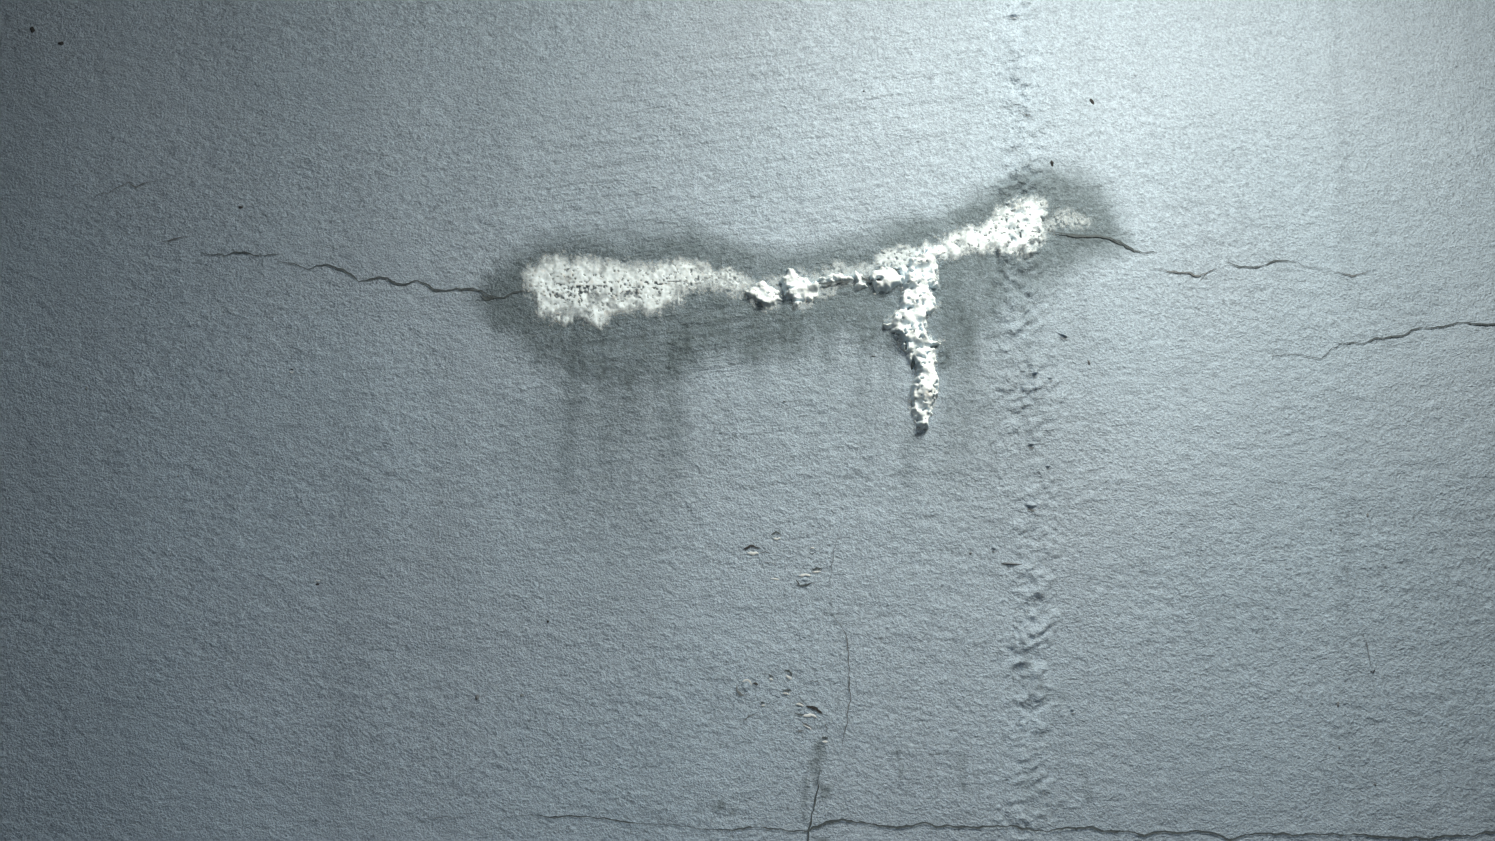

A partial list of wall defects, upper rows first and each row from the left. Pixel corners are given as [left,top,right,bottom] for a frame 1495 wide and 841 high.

crack [160,236,535,300]
crack [1048,230,1376,281]
leakage [524,199,1047,430]
crack [1273,322,1495,359]
crack [403,522,1495,841]